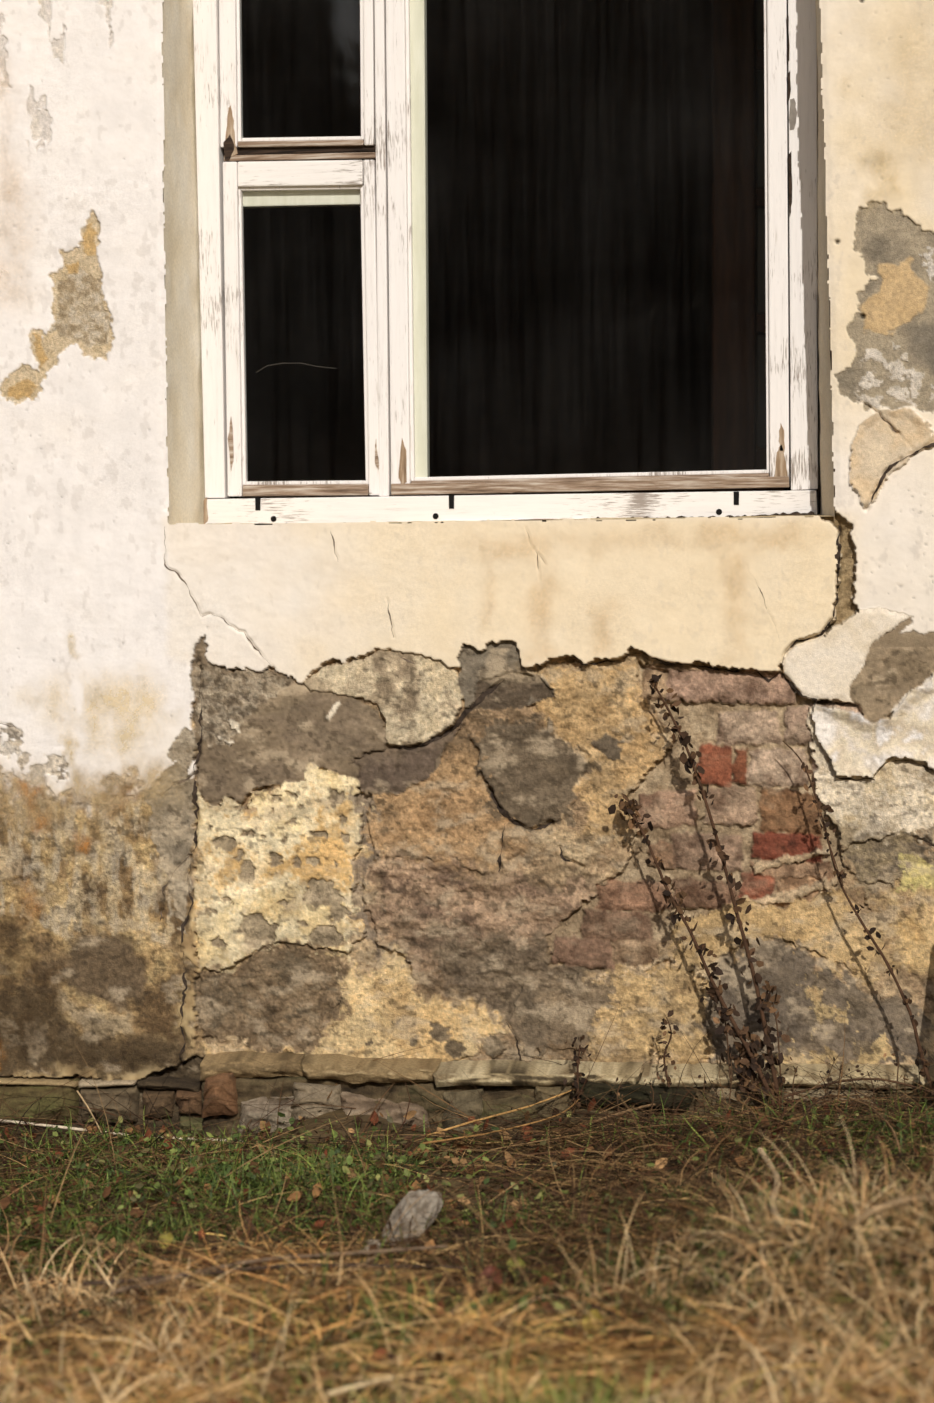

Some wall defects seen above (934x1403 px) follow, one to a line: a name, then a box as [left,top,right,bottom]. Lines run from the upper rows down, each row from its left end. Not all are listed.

peeling [0,0,10,89]
peeling [39,0,66,63]
peeling [27,88,53,150]
peeling [1,211,115,406]
peeling [835,202,934,412]
crack [164,527,270,664]
flaking render [0,607,934,1136]